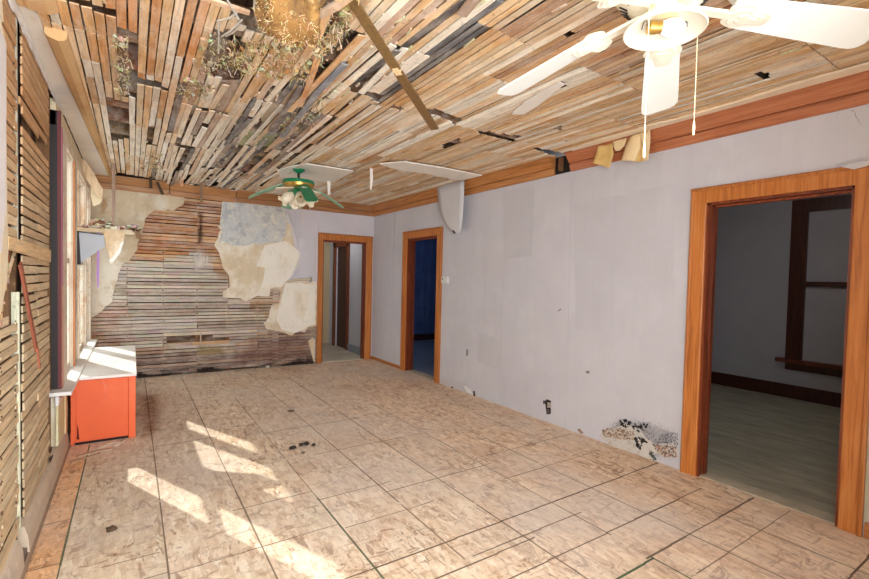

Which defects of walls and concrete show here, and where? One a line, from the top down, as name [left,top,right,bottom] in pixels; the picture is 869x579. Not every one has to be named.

spalling [166,333,229,346]